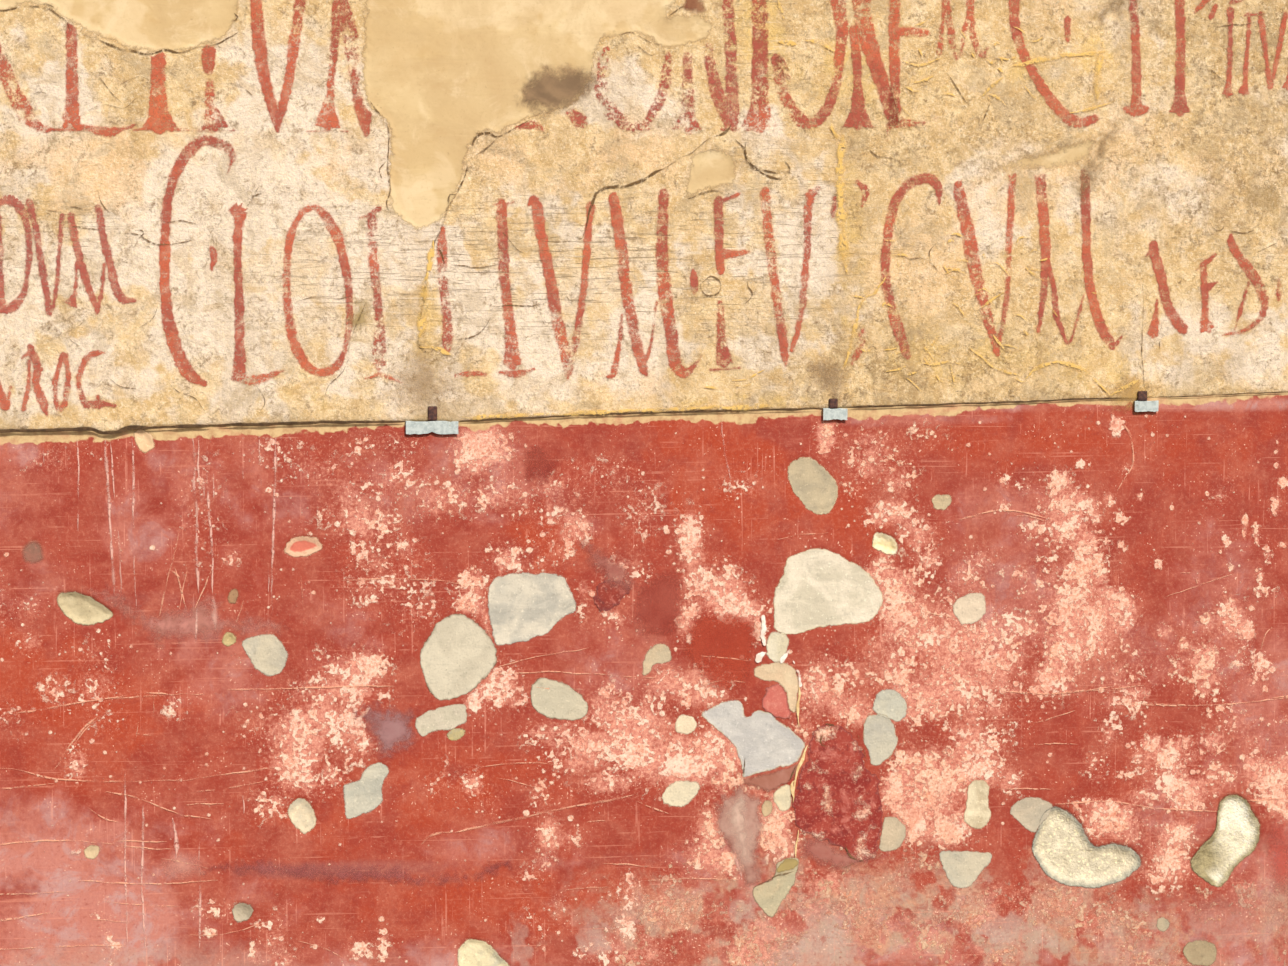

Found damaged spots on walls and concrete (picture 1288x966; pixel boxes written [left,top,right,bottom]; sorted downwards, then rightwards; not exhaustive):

peeling [1088,415,1125,436]
peeling [243,438,315,499]
spalling [228,589,238,604]
spalling [217,632,241,663]
spalling [0,592,138,782]
peeling [161,699,188,717]
spalling [280,424,1288,966]
peeling [241,644,393,834]
crack [755,682,868,887]